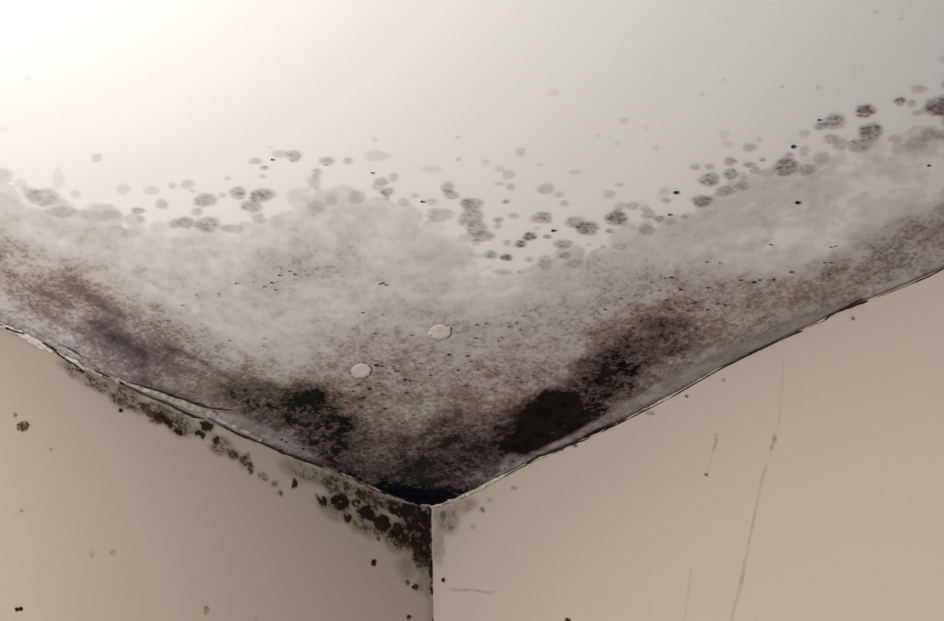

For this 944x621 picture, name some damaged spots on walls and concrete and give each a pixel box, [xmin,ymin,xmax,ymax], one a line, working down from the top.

damp [852,105,879,149]
damp [925,98,944,115]
flaking render [427,324,451,340]
damp [0,220,944,603]